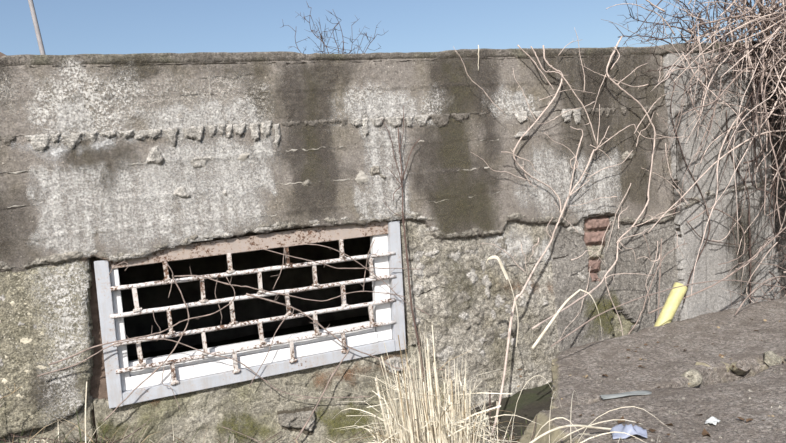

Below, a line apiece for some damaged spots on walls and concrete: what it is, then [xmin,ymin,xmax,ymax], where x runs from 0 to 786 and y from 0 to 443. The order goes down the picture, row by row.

spalling [0,112,486,165]
water stain [281,60,346,217]
water stain [345,52,534,238]
spalling [79,243,169,262]
water stain [28,56,276,413]
spalling [244,221,298,233]
water stain [495,232,551,259]
spalling [309,181,769,414]